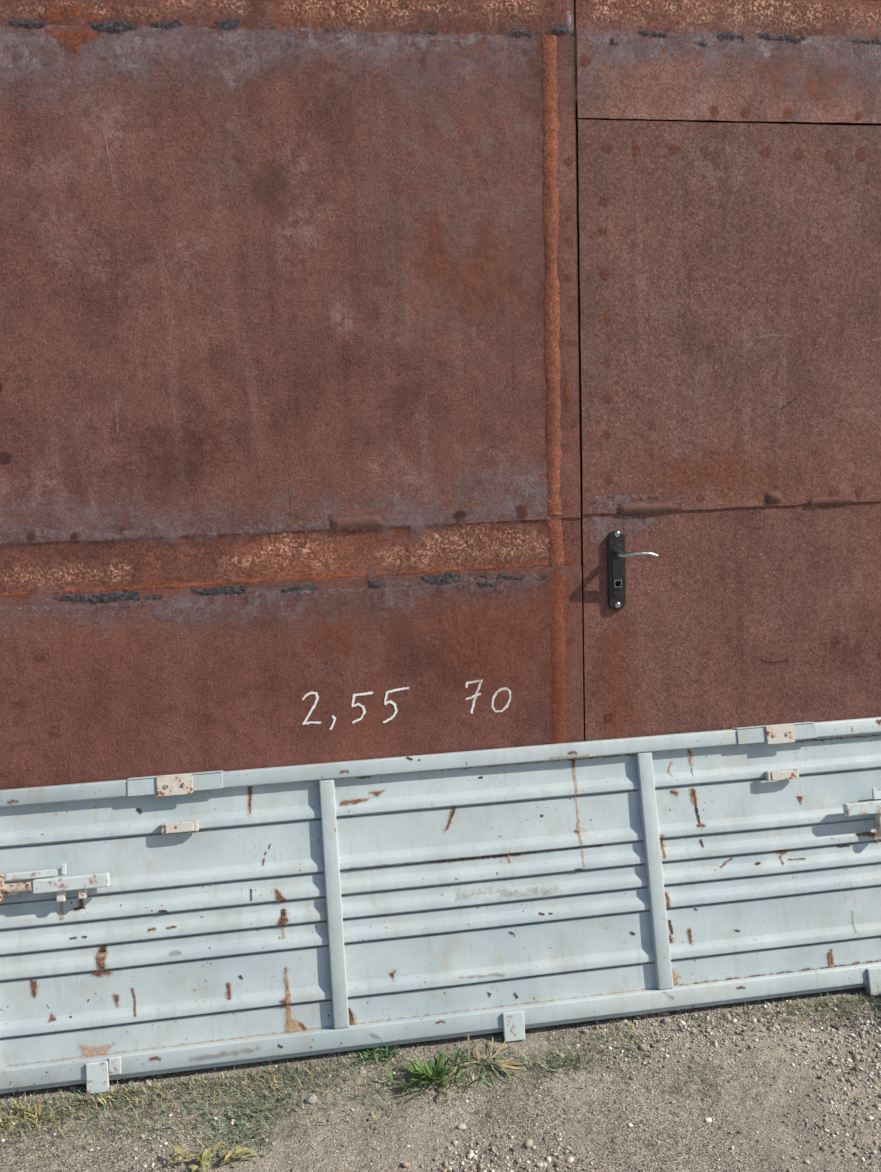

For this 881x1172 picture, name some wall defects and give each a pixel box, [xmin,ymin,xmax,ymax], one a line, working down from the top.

corrosion [286,0,465,28]
corrosion [484,0,538,20]
corrosion [592,0,881,32]
corrosion [5,504,550,596]